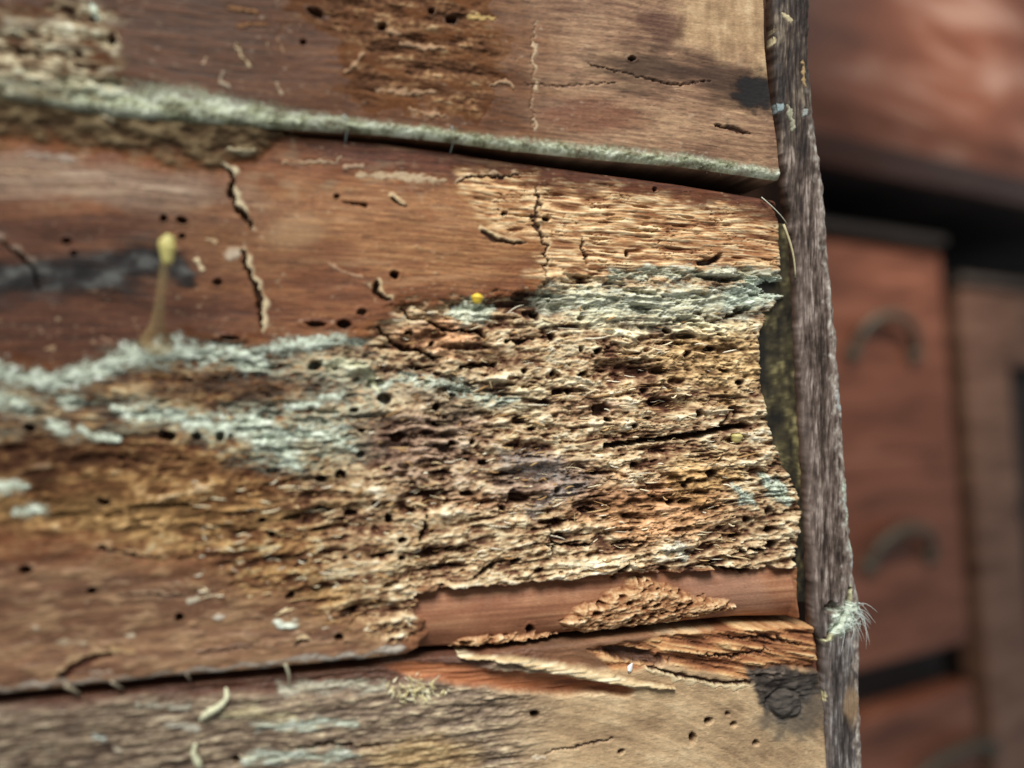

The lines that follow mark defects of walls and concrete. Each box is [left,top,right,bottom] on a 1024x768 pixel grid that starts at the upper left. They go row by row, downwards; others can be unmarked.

crack [524,20,707,132]
damp [618,56,771,112]
damp [353,169,448,186]
damp [0,247,196,294]
crack [220,161,272,334]
damp [444,298,496,328]
crack [454,168,554,277]
damp [529,263,782,320]
damp [0,333,519,414]
damp [46,418,122,442]
damp [110,390,358,470]
spalling [583,626,817,680]